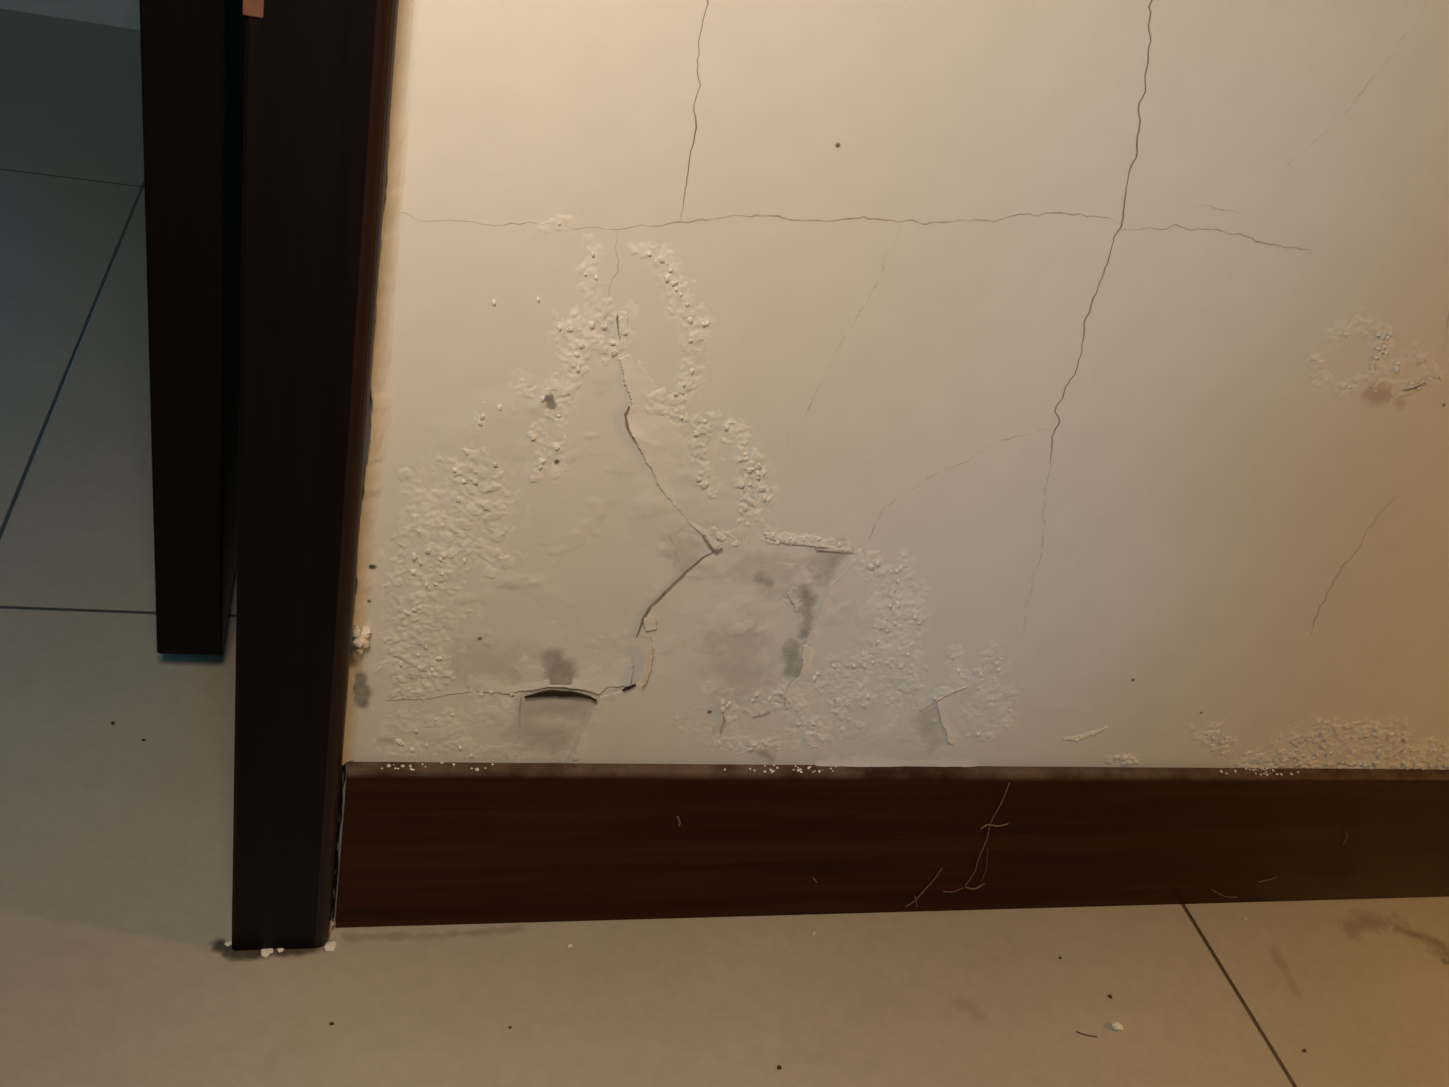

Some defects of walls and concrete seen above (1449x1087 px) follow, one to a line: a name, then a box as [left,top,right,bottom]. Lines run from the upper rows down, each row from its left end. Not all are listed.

crack [399,0,1312,631]
spalling [349,625,371,706]
peeling [386,354,1020,767]
crack [1309,499,1394,637]